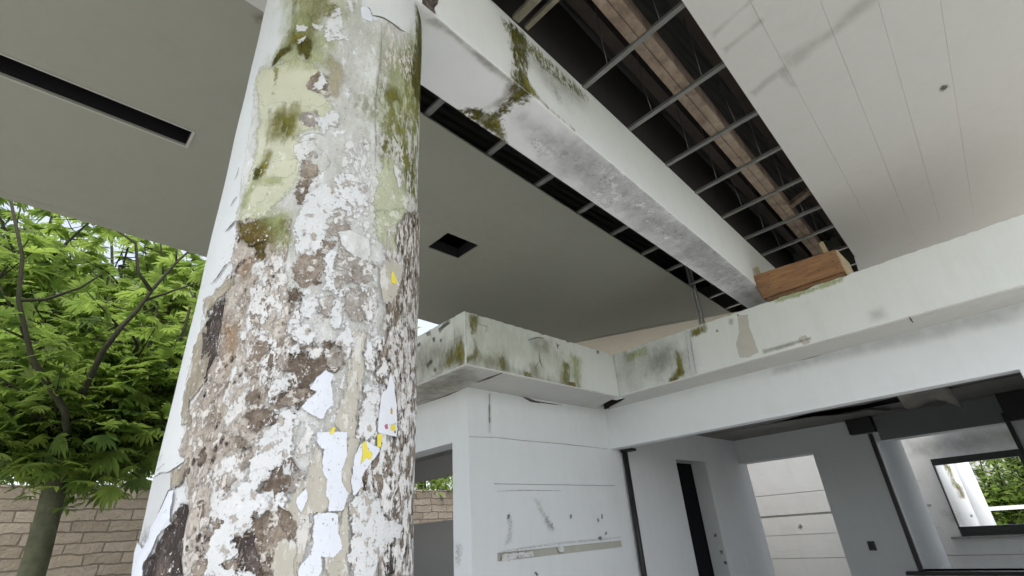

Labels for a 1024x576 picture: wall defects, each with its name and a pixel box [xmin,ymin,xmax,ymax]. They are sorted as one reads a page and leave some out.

spalling [422,0,438,14]
leakage [272,37,312,81]
leakage [465,112,501,136]
leakage [385,139,414,191]
peeling [131,0,420,576]
leakage [447,341,464,367]
leakage [564,357,578,387]
peeling [737,315,758,357]